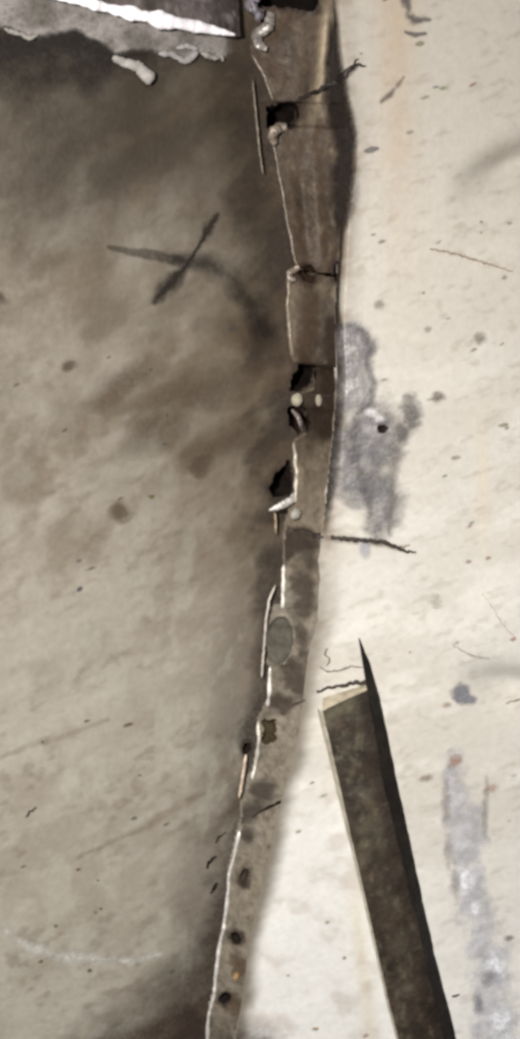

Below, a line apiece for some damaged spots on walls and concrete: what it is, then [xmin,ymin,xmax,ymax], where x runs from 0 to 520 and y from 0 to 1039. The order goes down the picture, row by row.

peeling [269,492,295,511]
crack [301,528,416,554]